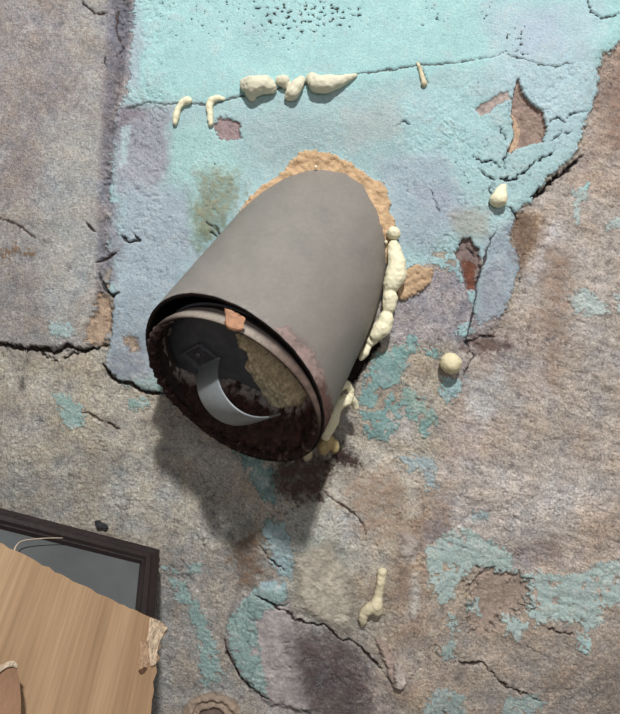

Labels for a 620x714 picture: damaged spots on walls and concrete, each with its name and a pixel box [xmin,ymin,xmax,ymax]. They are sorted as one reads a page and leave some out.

crack [357,51,573,82]
crack [117,95,245,111]
peeling [83,0,620,413]
peeling [47,319,75,339]
crack [464,234,495,372]
crack [0,342,165,395]
rust [276,326,333,433]
peeling [393,452,441,493]
peeling [425,509,620,662]
crack [257,596,389,679]
crack [224,639,269,699]
crack [450,661,540,701]